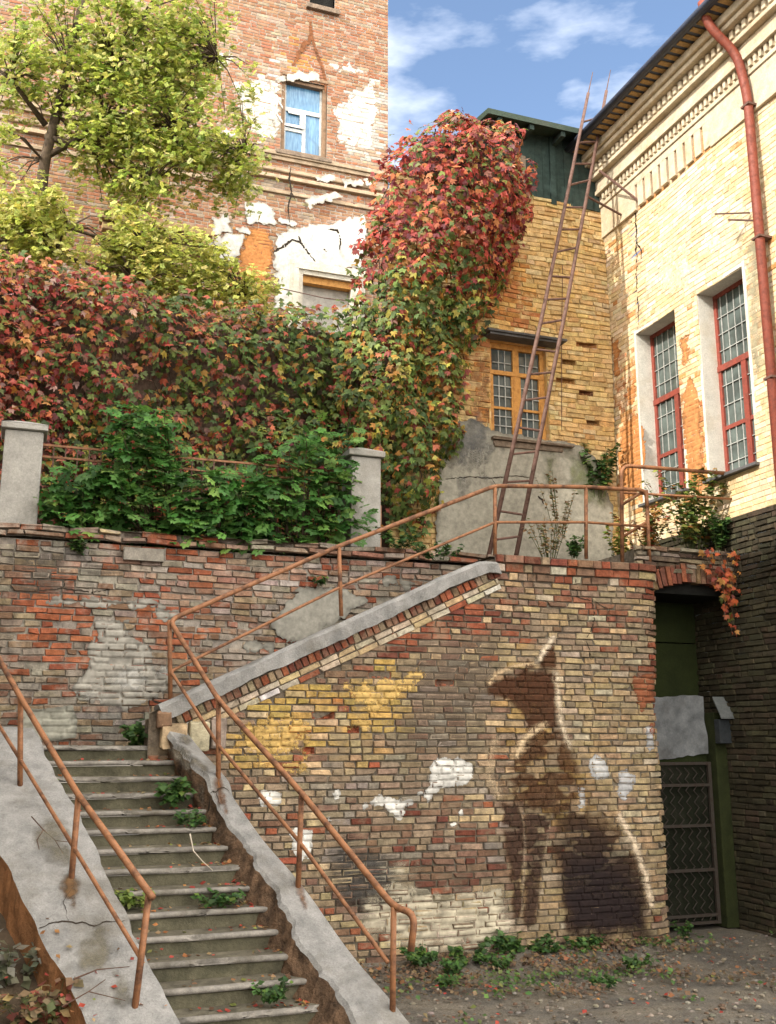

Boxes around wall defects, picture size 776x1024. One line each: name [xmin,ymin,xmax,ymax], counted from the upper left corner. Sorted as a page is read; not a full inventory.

peeling [216,52,320,144]
peeling [329,61,380,150]
peeling [208,197,367,310]
crack [273,168,341,261]
peeling [305,173,376,210]
peeling [679,334,705,492]
crack [39,890,125,928]